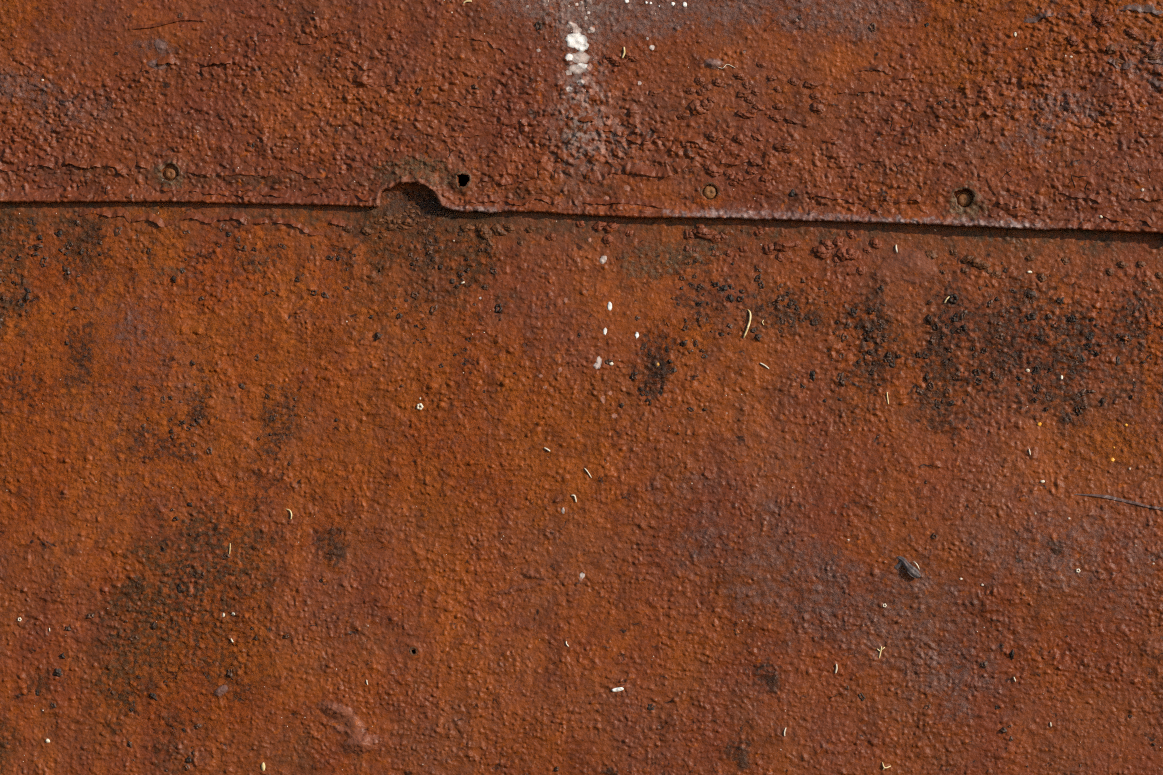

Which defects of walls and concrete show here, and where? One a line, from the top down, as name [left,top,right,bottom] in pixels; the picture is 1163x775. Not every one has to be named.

damp [514,0,923,40]
corrosion [920,0,1163,88]
corrosion [676,61,827,125]
corrosion [705,131,795,153]
corrosion [0,216,36,336]
corrosion [332,189,556,305]
corrosion [575,220,634,247]
spalling [630,372,672,408]
spalling [640,259,828,374]
corrosion [667,223,883,276]
corrosion [835,249,1163,465]
corrosion [91,385,294,766]